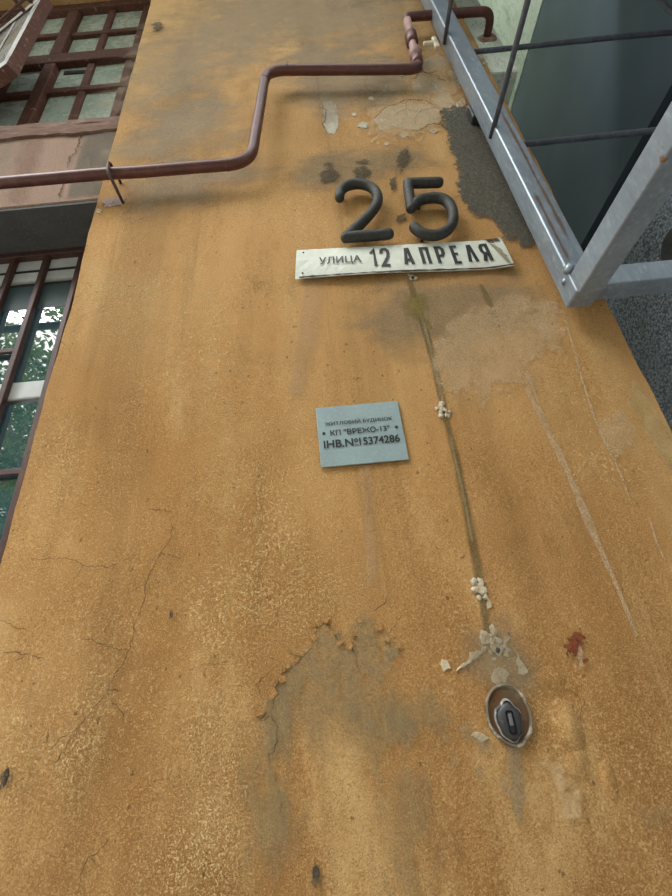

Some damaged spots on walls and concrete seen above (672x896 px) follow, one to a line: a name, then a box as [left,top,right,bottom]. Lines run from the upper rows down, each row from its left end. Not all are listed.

damp [289,49,391,64]
spalling [321,92,339,135]
damp [297,75,399,108]
spalling [352,53,468,146]
damp [70,181,102,196]
damp [376,279,523,684]
crack [37,509,177,764]
peeling [440,624,528,685]
corrosion [564,628,589,664]
peeling [153,569,401,894]
crack [76,835,113,894]